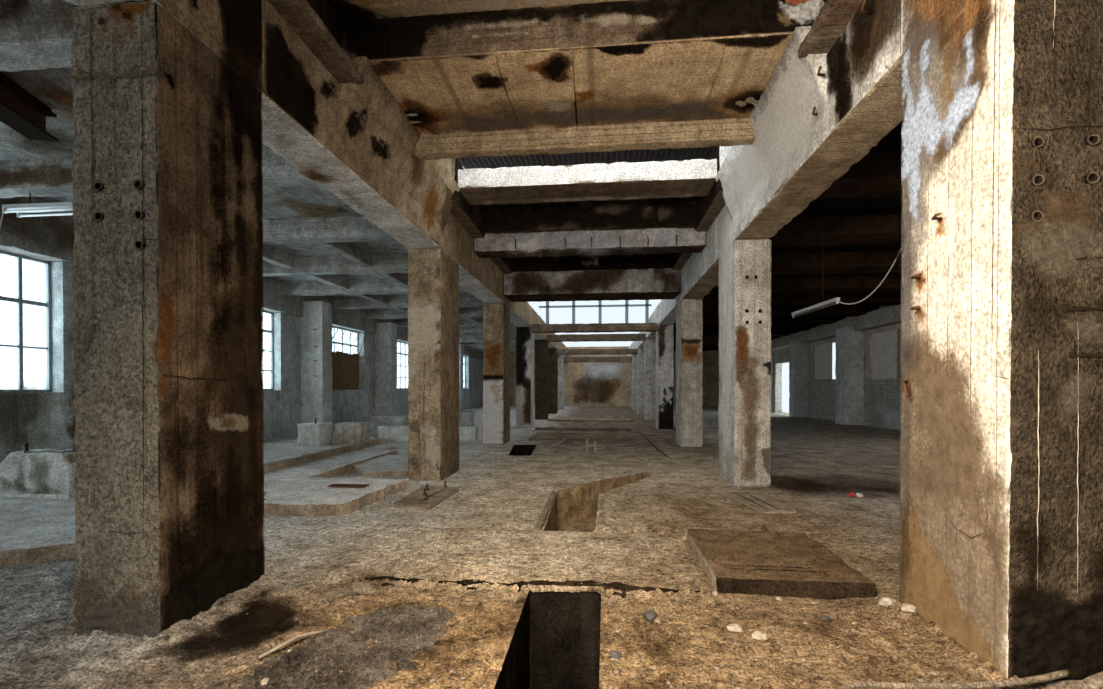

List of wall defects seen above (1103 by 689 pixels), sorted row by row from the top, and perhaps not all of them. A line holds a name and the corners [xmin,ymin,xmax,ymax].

water stain [327,0,825,75]
peeling [559,41,682,55]
peeling [707,0,824,48]
rust [976,13,990,49]
water stain [878,337,1103,681]